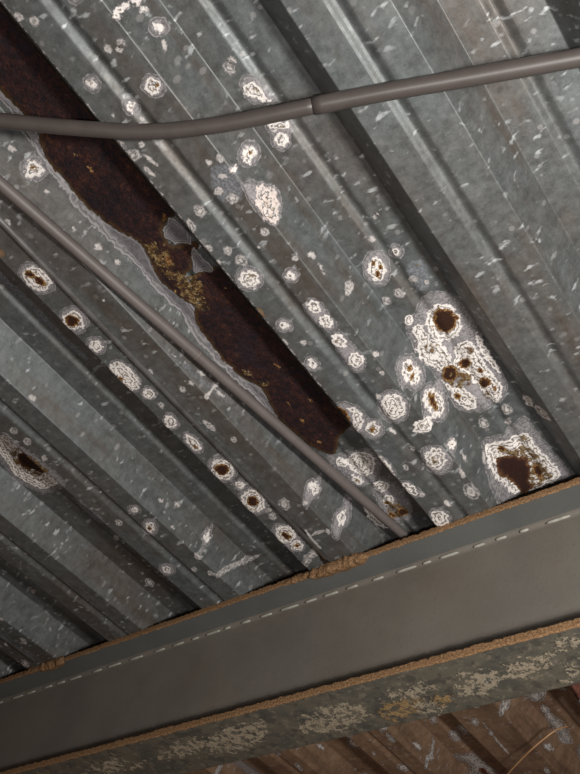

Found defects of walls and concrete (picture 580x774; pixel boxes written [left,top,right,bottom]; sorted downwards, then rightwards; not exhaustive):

corrosion [0,0,96,121]
corrosion [83,74,101,91]
corrosion [104,39,126,53]
corrosion [111,0,170,51]
corrosion [140,73,166,98]
corrosion [223,56,277,105]
corrosion [122,99,145,122]
corrosion [265,120,292,152]
corrosion [0,131,580,683]
corrosion [0,618,580,774]